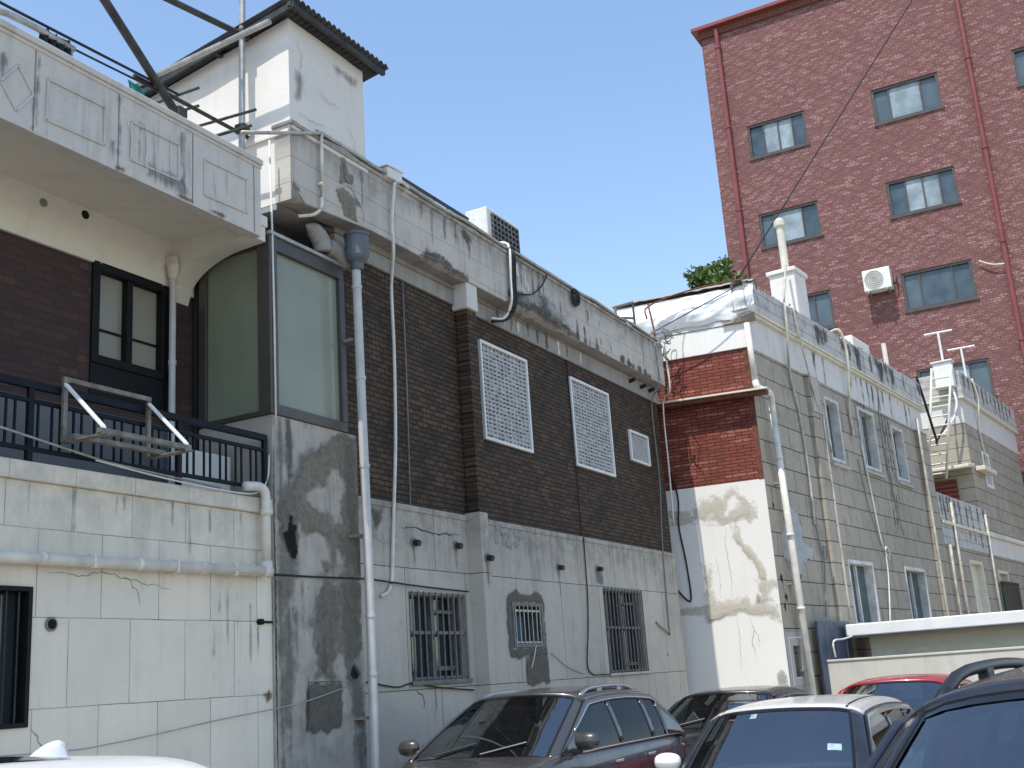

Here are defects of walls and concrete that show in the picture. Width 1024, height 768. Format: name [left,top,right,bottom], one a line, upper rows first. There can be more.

peeling [336,158,364,222]
water stain [420,203,470,249]
water stain [497,312,607,363]
water stain [812,325,827,384]
water stain [841,343,921,531]
spalling [278,434,363,679]
crack [47,571,168,602]